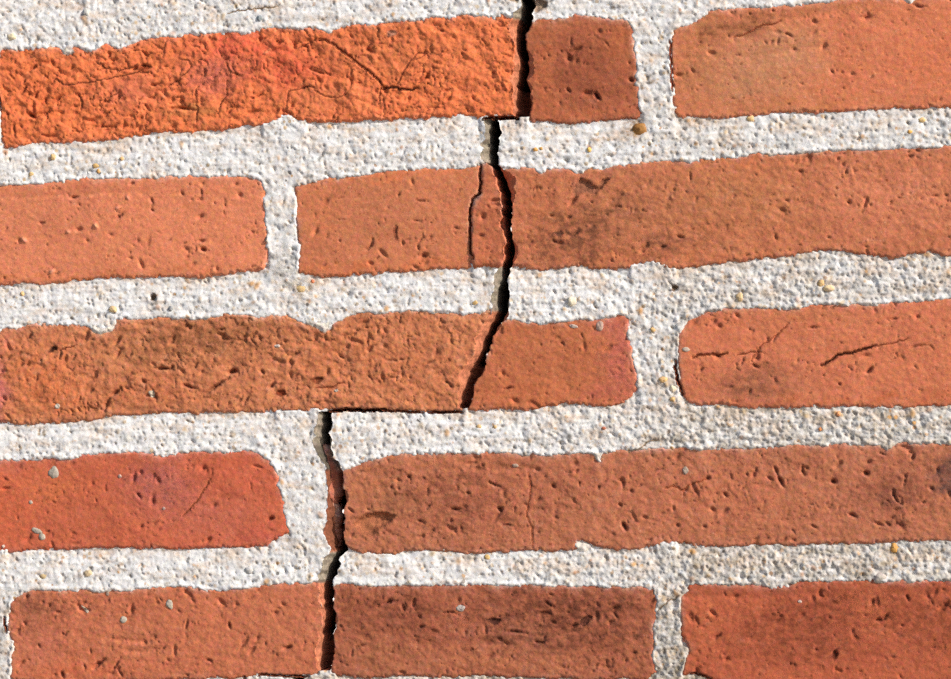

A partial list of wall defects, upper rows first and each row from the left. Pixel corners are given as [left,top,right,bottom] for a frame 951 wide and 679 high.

crack [227,6,278,14]
crack [244,0,536,679]
crack [665,477,710,496]